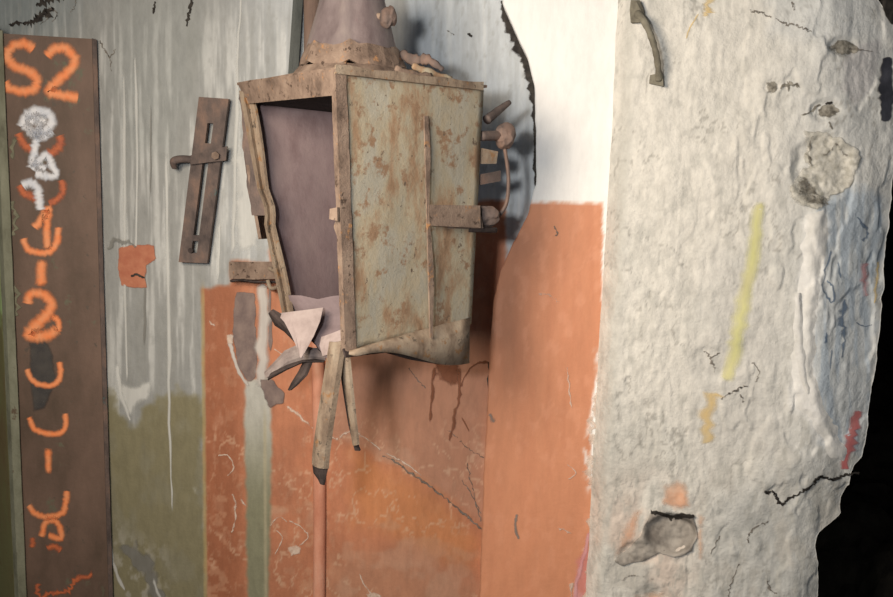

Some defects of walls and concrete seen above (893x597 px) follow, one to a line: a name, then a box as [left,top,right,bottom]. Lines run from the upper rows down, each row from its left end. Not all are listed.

crack [9,0,76,28]
crack [501,1,537,186]
spalling [790,101,861,209]
peeling [107,238,156,288]
peeling [227,285,284,407]
crack [383,431,484,529]
spalling [615,484,701,566]
crack [747,472,860,543]